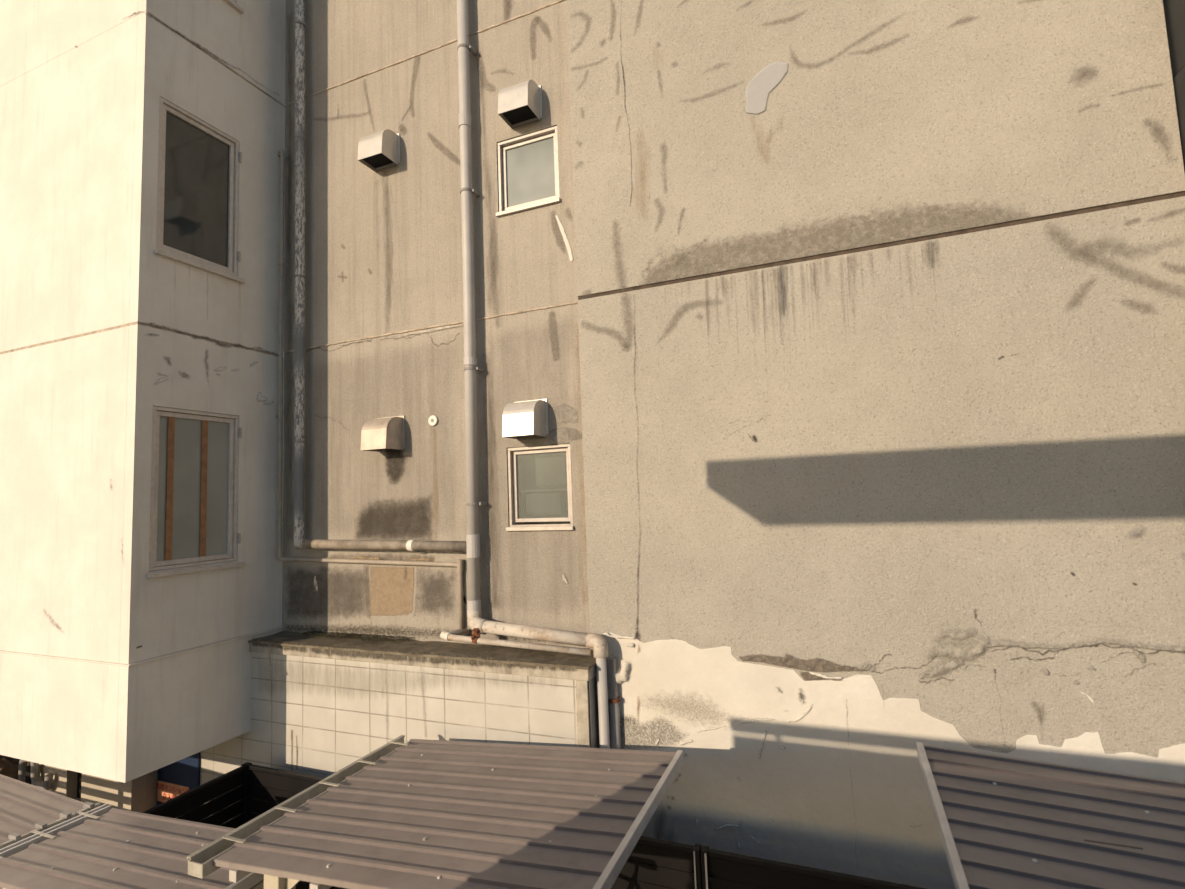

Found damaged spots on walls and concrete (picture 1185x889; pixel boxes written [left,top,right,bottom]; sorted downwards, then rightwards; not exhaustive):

damp [252,570,573,670]
spalling [740,654,875,681]